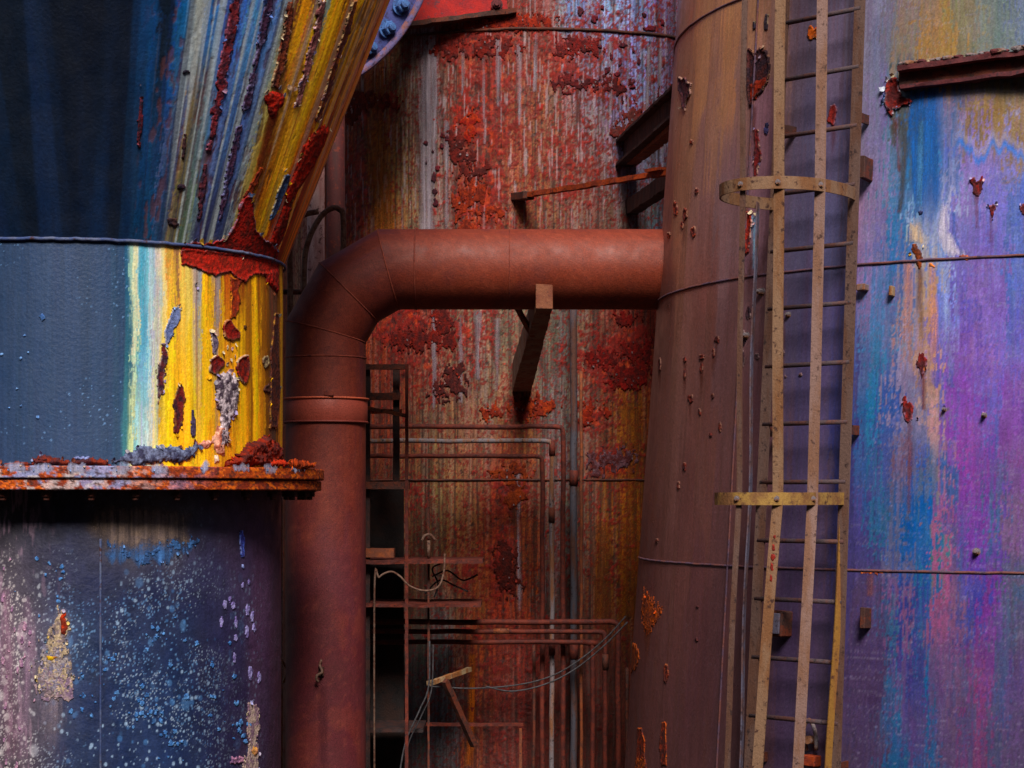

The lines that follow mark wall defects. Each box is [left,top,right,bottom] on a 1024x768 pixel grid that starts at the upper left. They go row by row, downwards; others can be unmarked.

peeling [206,0,240,151]
peeling [241,0,273,111]
peeling [293,0,327,108]
peeling [879,73,913,116]
peeling [197,164,207,220]
peeling [219,125,243,220]
peeling [269,168,291,220]
rust [511,167,666,201]
peeling [106,304,282,474]
peeling [1,595,96,719]
rust [641,588,663,635]